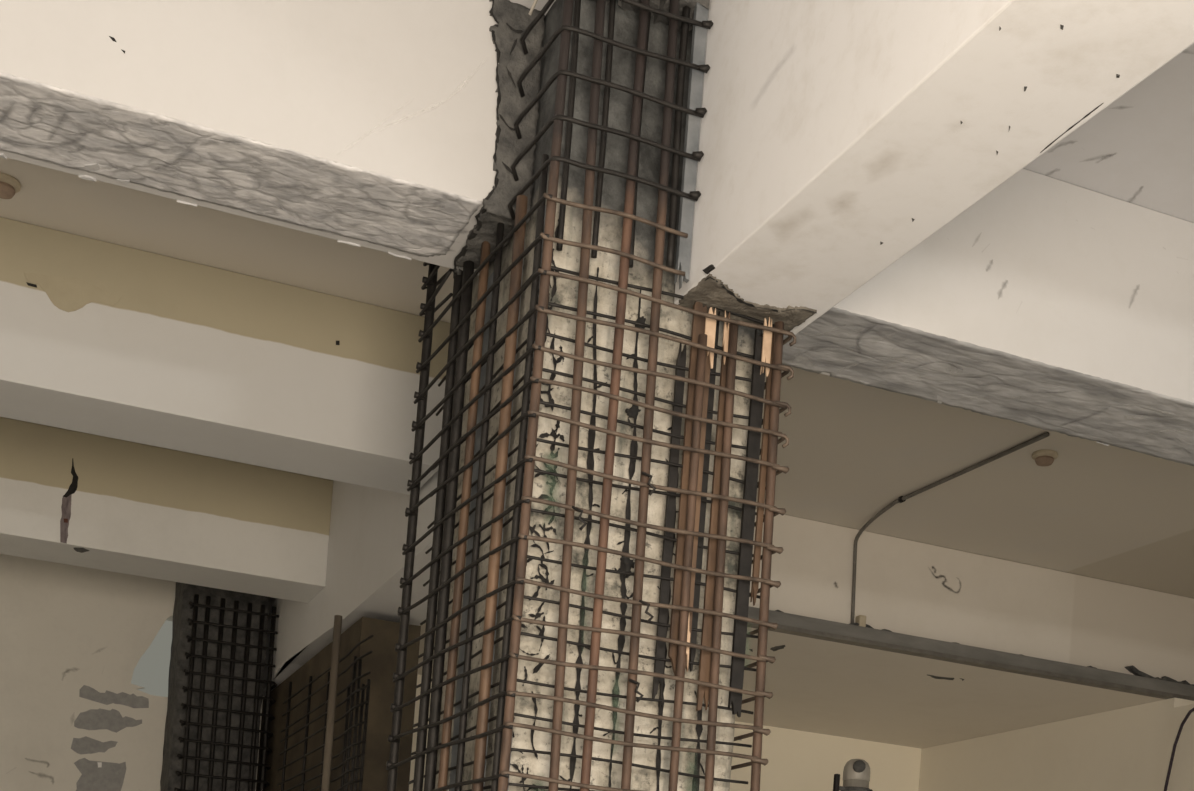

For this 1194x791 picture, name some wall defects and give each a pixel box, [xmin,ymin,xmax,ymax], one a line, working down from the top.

spalling [595,0,710,33]
crack [1040,103,1103,153]
spalling [625,406,641,419]
crack [510,219,679,791]
spalling [620,556,635,578]
peeling [71,685,149,791]
crack [692,691,705,791]